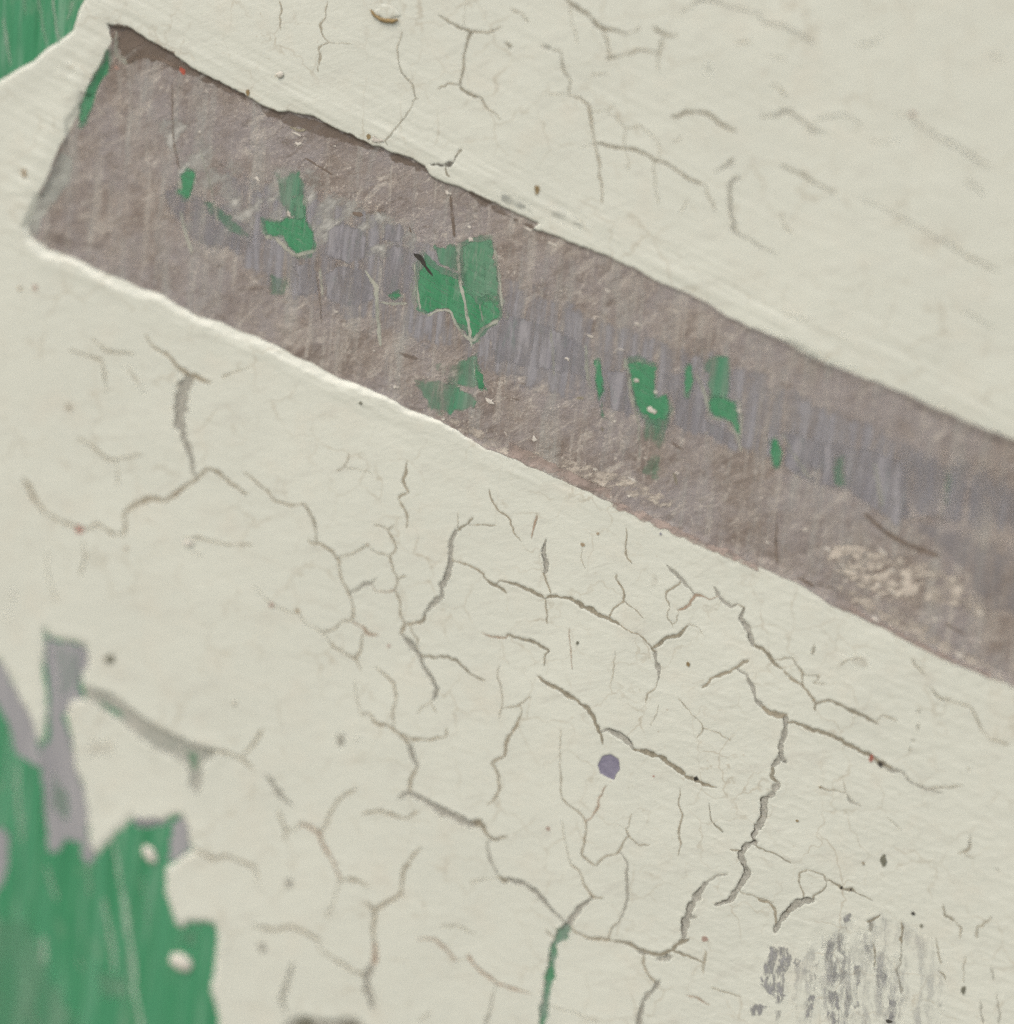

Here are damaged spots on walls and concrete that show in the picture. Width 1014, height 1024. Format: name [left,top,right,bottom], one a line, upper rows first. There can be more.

peeling [0,0,84,79]
crack [317,4,329,71]
crack [438,9,528,119]
crack [566,0,678,60]
crack [431,149,462,177]
crack [542,45,776,254]
crack [759,109,825,133]
crack [22,335,962,1024]
crack [912,659,1009,745]
peeling [0,631,219,1024]
crack [942,905,992,937]